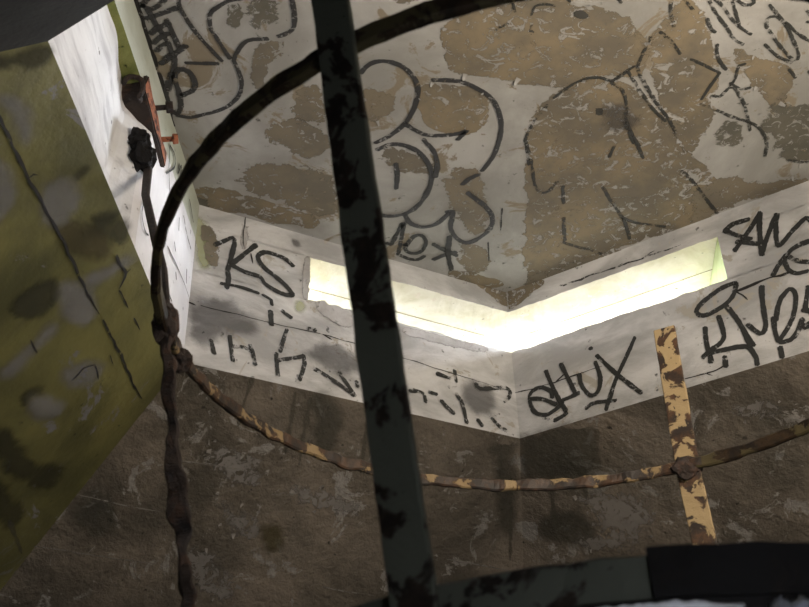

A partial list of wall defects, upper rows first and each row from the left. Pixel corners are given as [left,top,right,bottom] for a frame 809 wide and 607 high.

peeling [363,87,396,126]
peeling [195,85,339,229]
peeling [382,147,434,174]